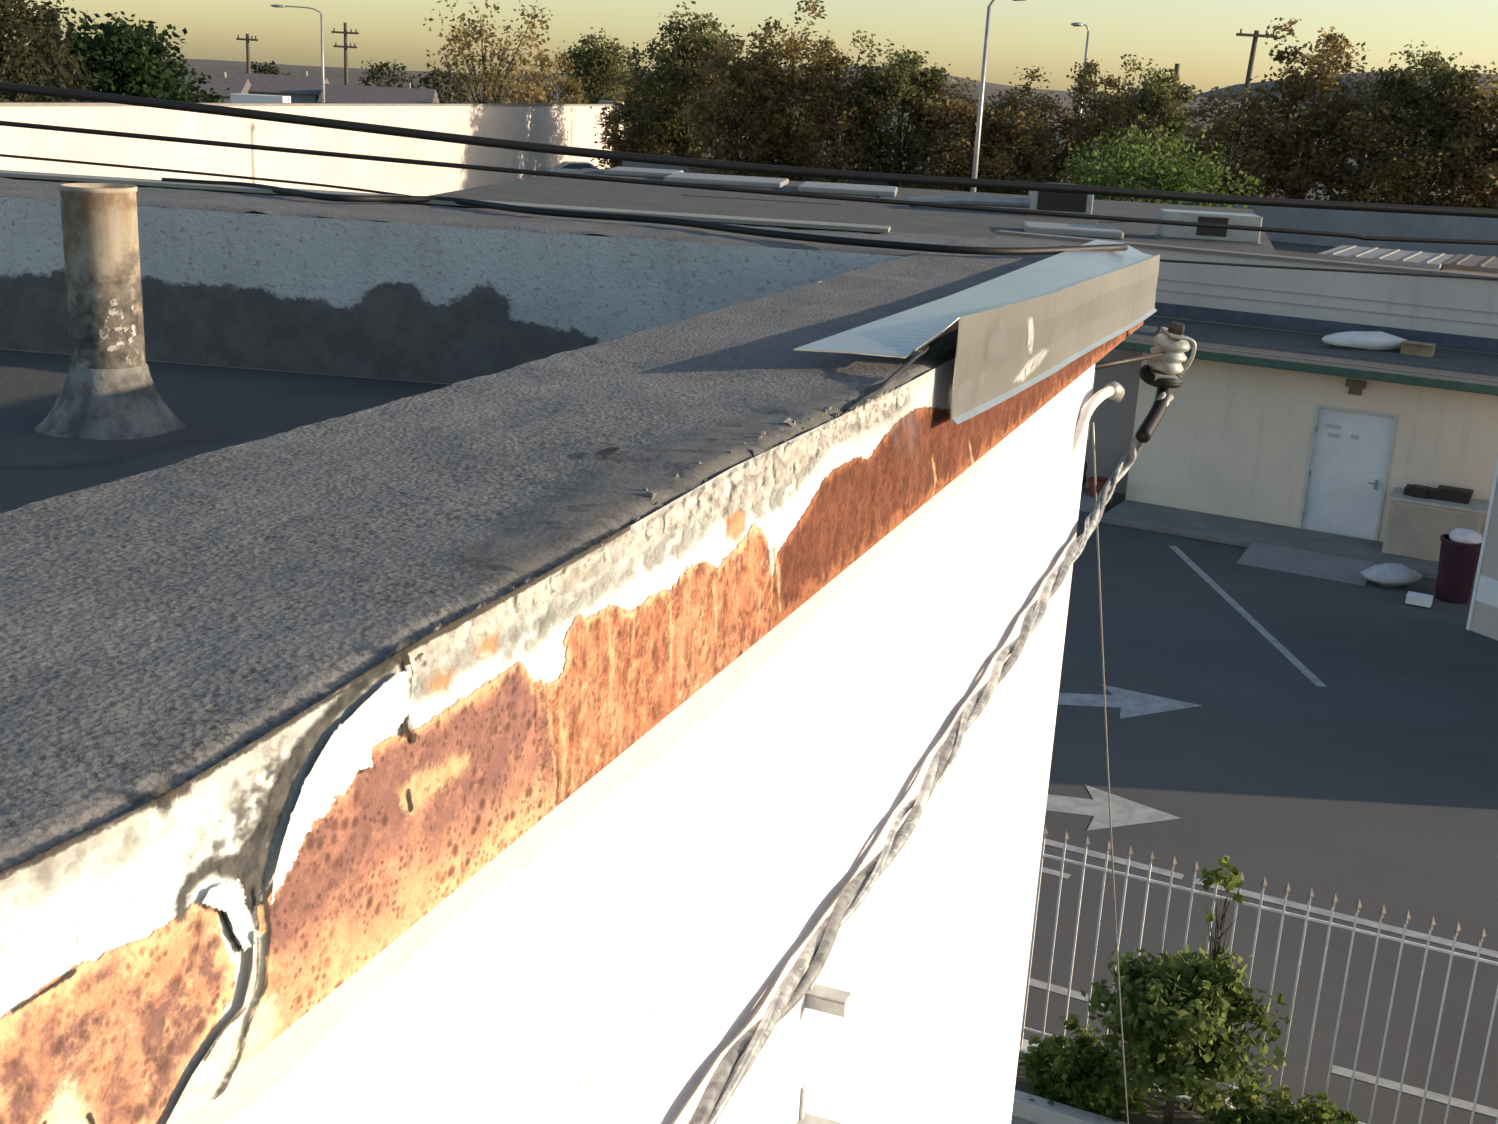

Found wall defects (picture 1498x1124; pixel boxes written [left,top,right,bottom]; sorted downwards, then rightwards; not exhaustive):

leakage [0,269,70,354]
leakage [141,275,598,384]
flaking render [166,388,1027,1124]
corrosion [250,321,1144,1049]
corrosion [0,903,237,1124]